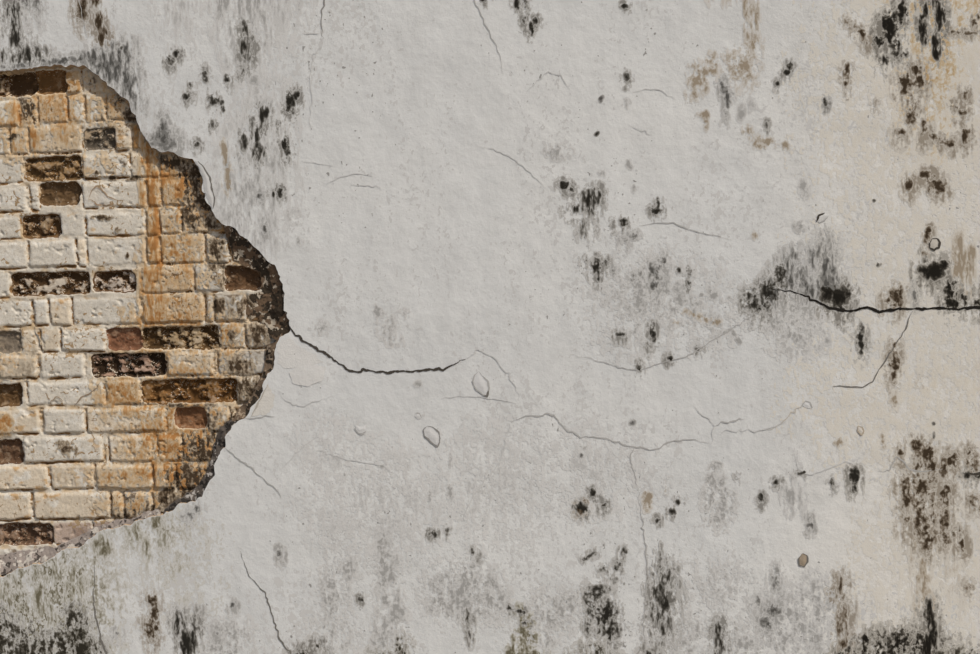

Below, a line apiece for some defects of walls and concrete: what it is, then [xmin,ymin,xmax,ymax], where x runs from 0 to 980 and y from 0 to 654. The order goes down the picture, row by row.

leakage [0,0,319,262]
crack [306,0,325,126]
crack [474,0,503,72]
spalling [0,64,323,577]
leakage [280,0,980,654]
crack [571,288,980,388]
leakage [0,498,266,654]
crack [286,324,805,654]